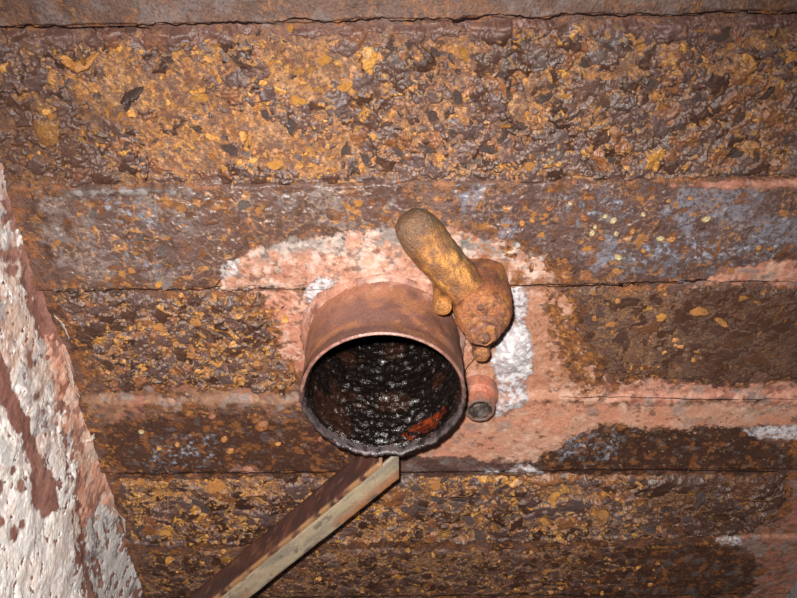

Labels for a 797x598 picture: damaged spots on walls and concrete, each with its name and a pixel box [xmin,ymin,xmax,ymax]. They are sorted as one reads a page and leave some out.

crack [0,10,797,32]
peeling [0,162,432,598]
corrosion [403,406,447,439]
peeling [723,478,797,598]